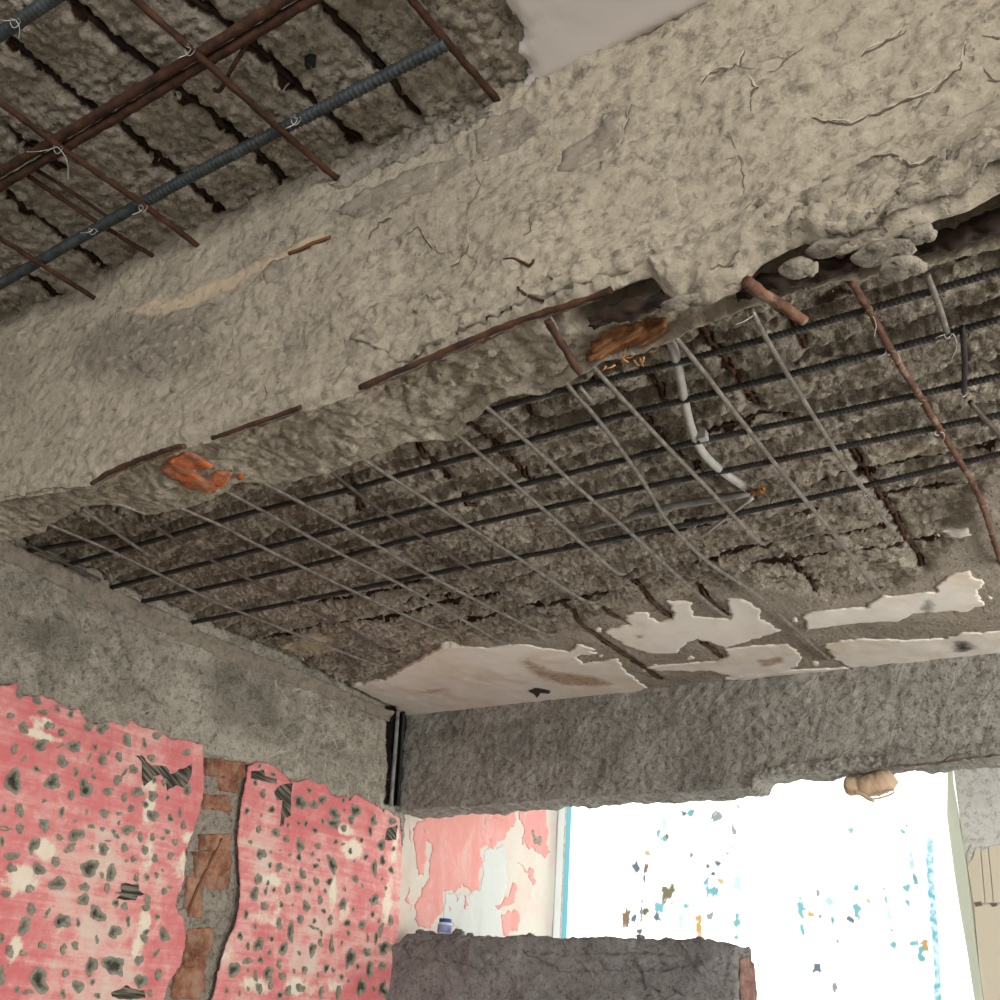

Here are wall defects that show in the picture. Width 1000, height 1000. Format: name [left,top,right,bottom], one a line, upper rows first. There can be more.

crack [701,45,806,111]
crack [861,25,907,57]
crack [810,35,1000,126]
spalling [0,39,449,290]
spalling [328,103,540,219]
corrosion [913,207,1000,262]
corrosion [358,286,671,396]
corrosion [736,251,881,349]
peeling [0,232,1000,721]
corrosion [695,447,969,593]
flaking render [0,686,397,1000]
peeling [405,810,550,937]